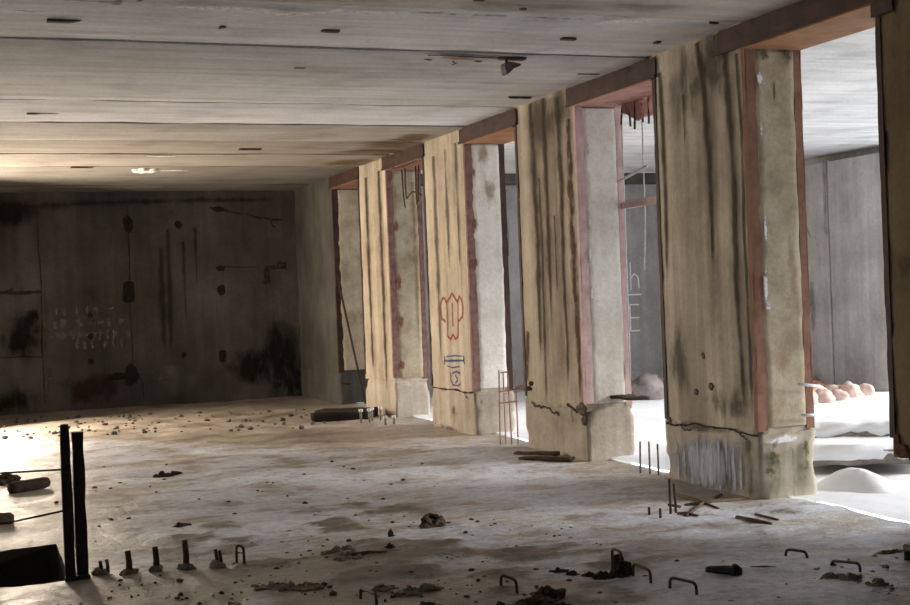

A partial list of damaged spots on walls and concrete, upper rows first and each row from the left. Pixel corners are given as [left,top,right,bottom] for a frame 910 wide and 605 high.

damp [658,72,667,268]
damp [432,143,460,350]
damp [678,41,752,413]
damp [10,311,38,357]
damp [230,325,302,396]
damp [673,337,685,381]
crack [532,402,579,421]
crack [666,422,758,440]
damp [676,425,751,493]